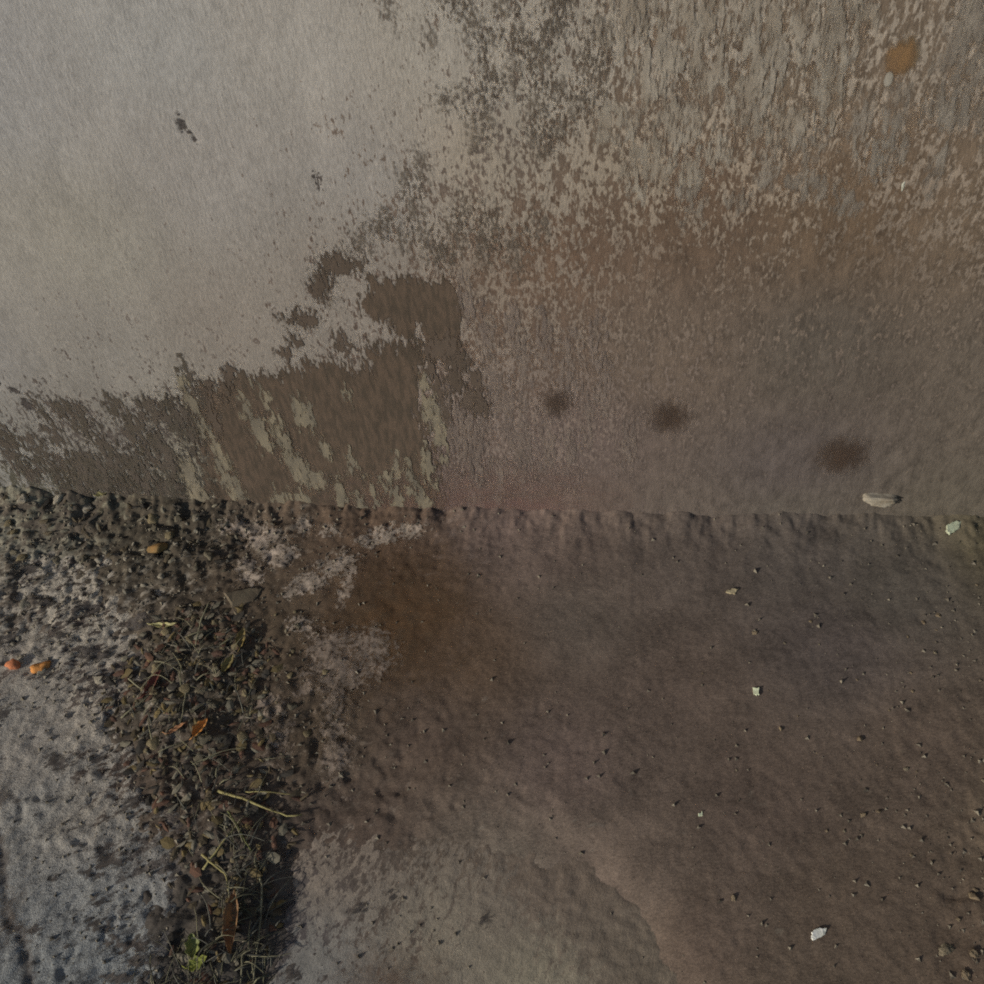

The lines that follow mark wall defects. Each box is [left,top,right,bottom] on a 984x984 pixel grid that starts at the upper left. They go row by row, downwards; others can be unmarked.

damp [182,244,492,511]
damp [214,515,428,609]